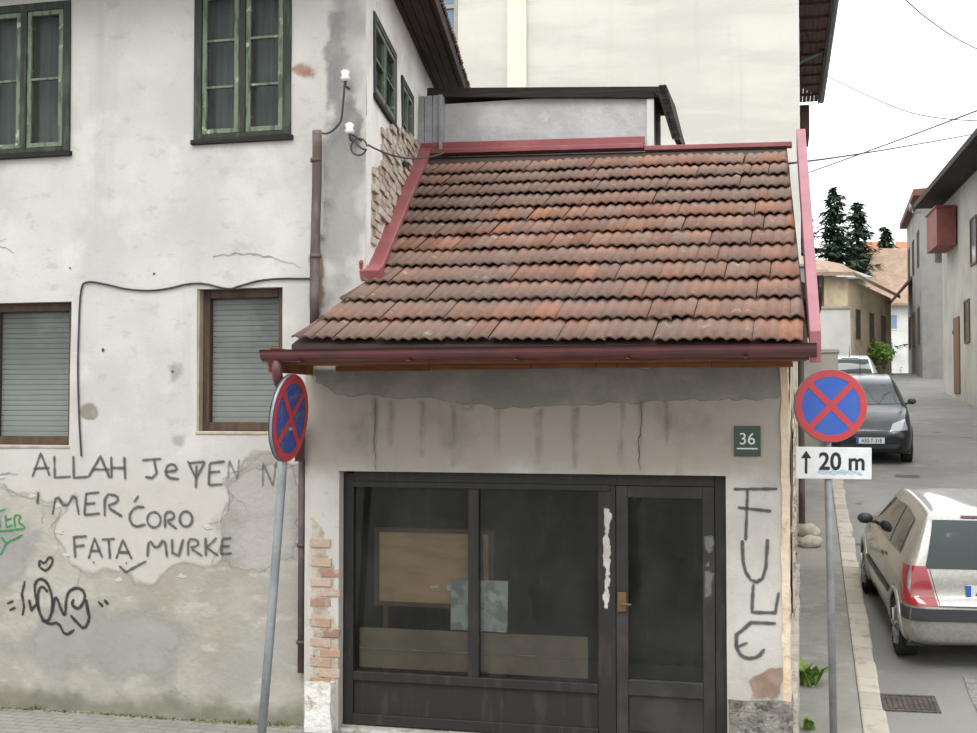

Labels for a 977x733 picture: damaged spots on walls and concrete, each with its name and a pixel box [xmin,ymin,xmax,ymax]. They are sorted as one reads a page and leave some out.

flaking render [370,124,420,247]
crack [212,252,300,268]
flaking render [0,452,341,726]